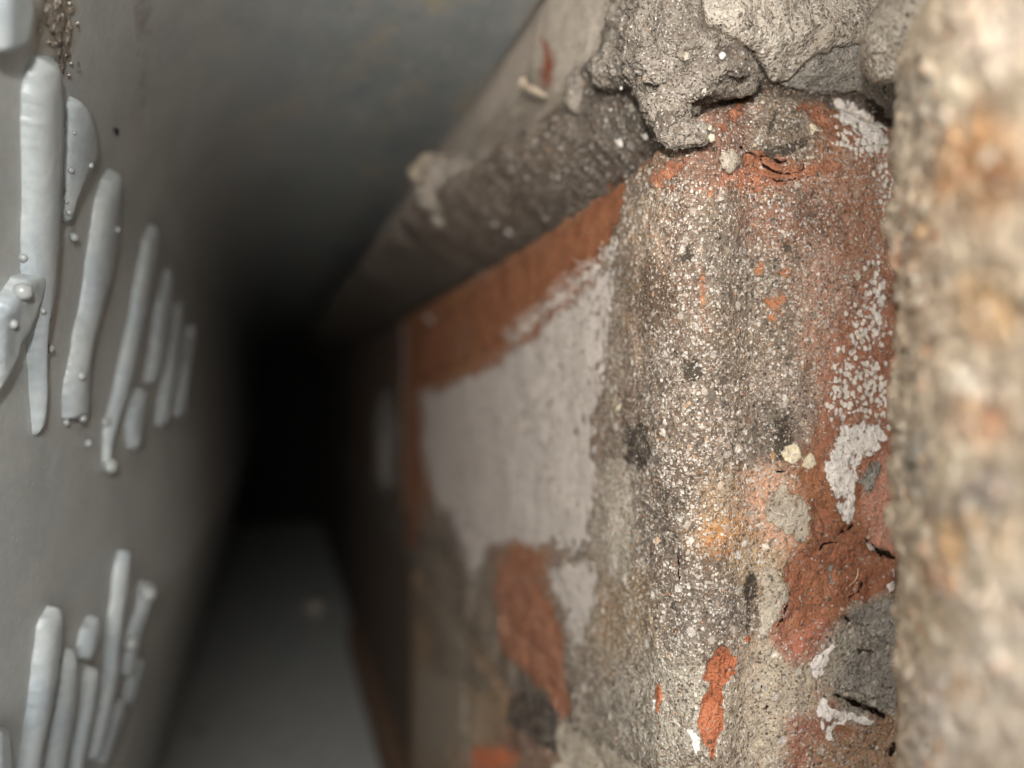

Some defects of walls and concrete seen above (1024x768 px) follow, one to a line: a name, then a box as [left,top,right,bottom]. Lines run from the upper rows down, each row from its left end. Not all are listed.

peeling [633,41,751,191]
crack [739,146,804,182]
spalling [743,150,849,180]
flaking render [796,102,852,148]
flaking render [416,179,626,382]
spalling [783,500,890,640]
crack [809,523,896,560]
spalling [495,557,571,720]
spalling [697,646,738,759]
crack [834,694,896,757]